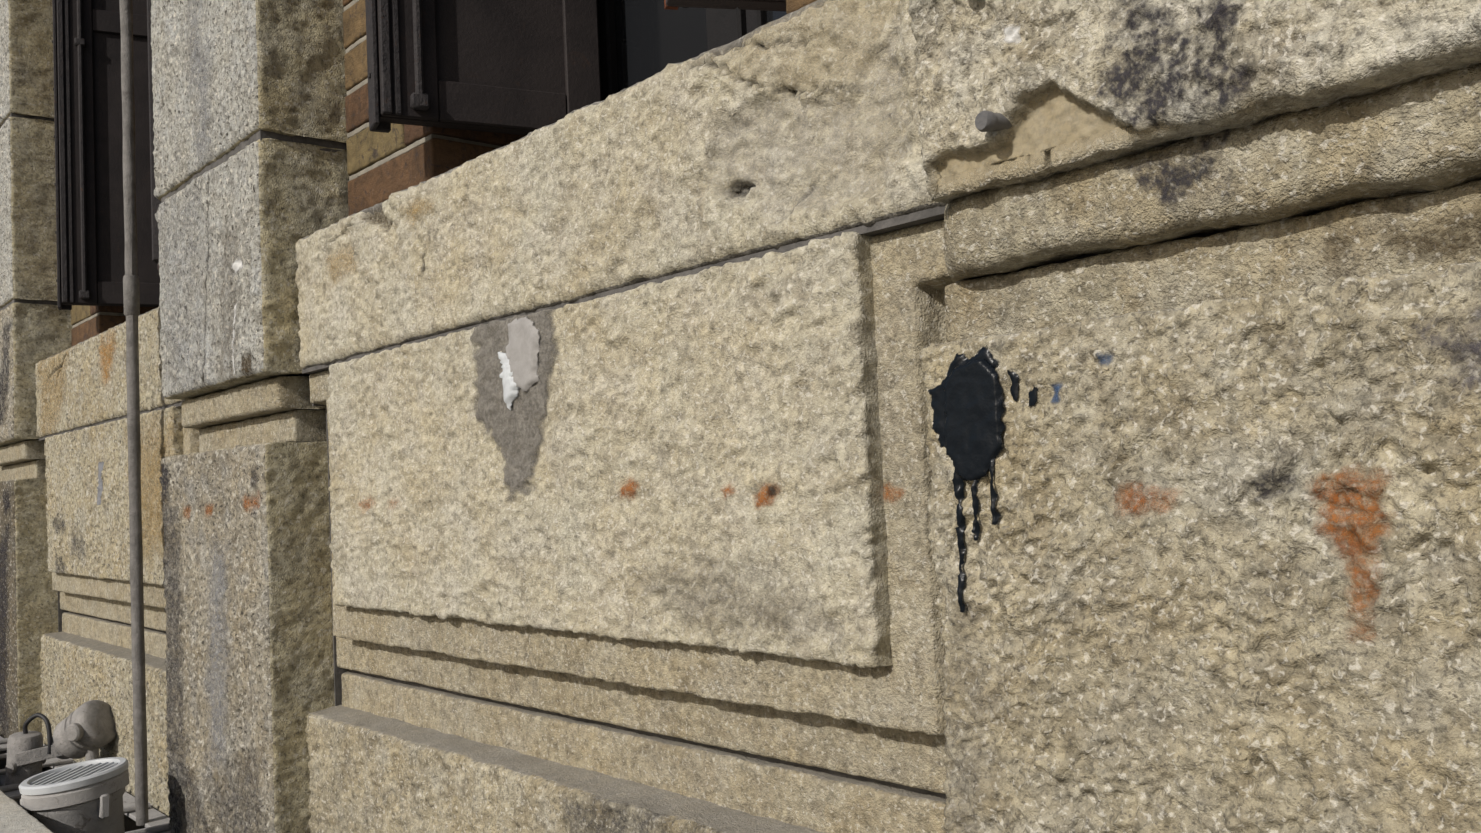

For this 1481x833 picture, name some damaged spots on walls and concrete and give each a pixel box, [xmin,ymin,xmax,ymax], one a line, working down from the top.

leakage [1097,0,1251,125]
leakage [1130,129,1229,203]
peeling [498,316,540,410]
rust [1315,473,1383,611]